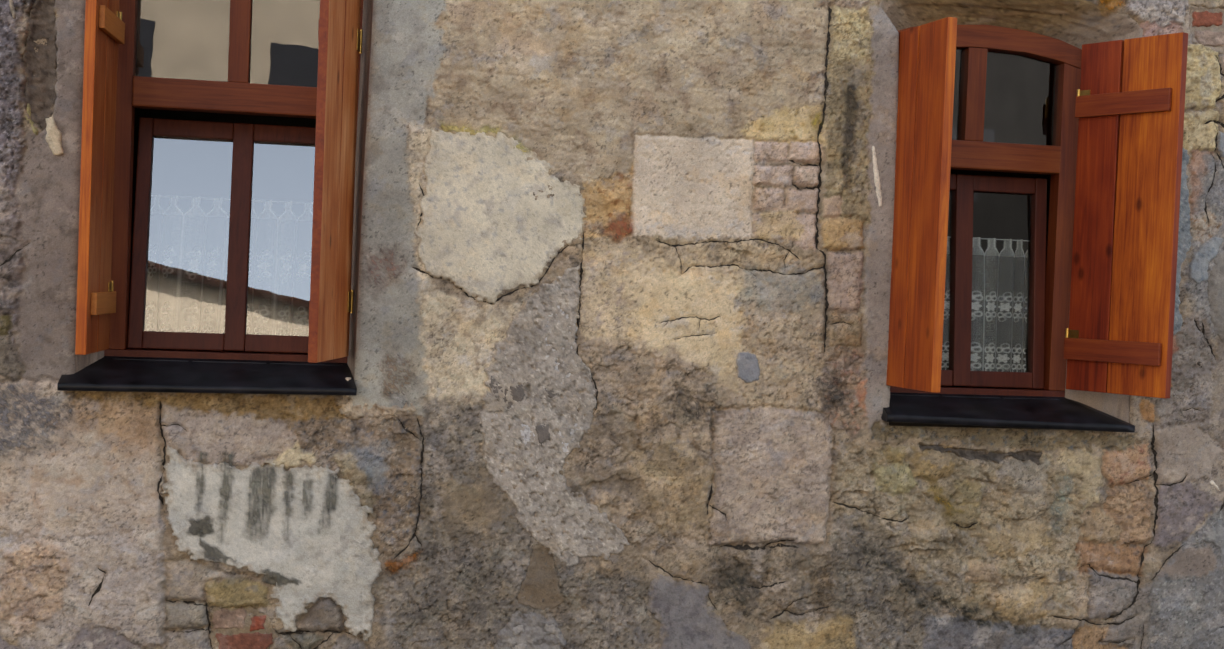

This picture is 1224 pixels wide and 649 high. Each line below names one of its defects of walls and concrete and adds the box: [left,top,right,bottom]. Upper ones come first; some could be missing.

crack [656,8,851,352]
crack [1204,55,1224,223]
crack [412,232,598,414]
crack [157,401,187,505]
flaking render [160,442,387,649]
crack [395,418,424,558]
crack [1053,425,1188,649]